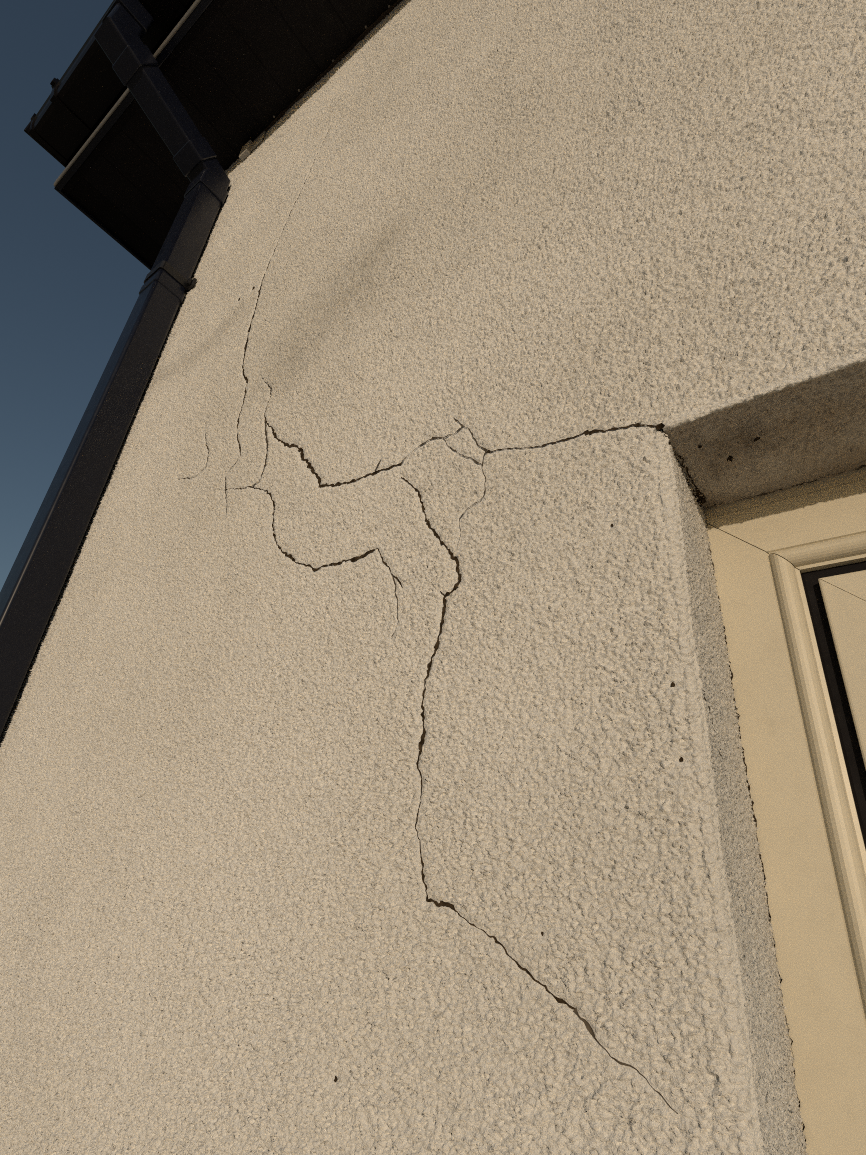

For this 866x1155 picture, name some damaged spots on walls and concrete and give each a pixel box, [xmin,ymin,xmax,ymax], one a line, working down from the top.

crack [183,131,706,1114]